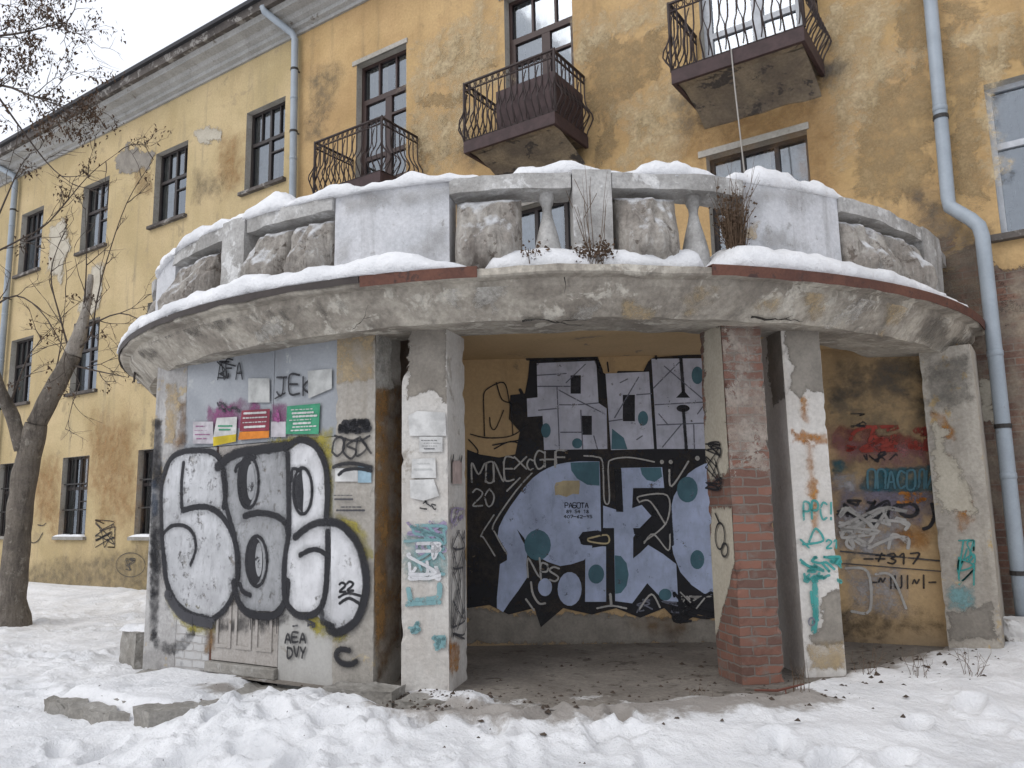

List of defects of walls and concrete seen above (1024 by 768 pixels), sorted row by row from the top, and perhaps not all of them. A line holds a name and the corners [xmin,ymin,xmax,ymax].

flaking render [114,142,155,194]
flaking render [939,236,983,318]
spalling [376,329,447,404]
flaking render [703,326,824,481]
rust [791,397,827,443]
flaking render [993,261,1024,538]
flaking render [926,320,1015,641]
rust [374,384,402,679]
spalling [807,588,845,670]